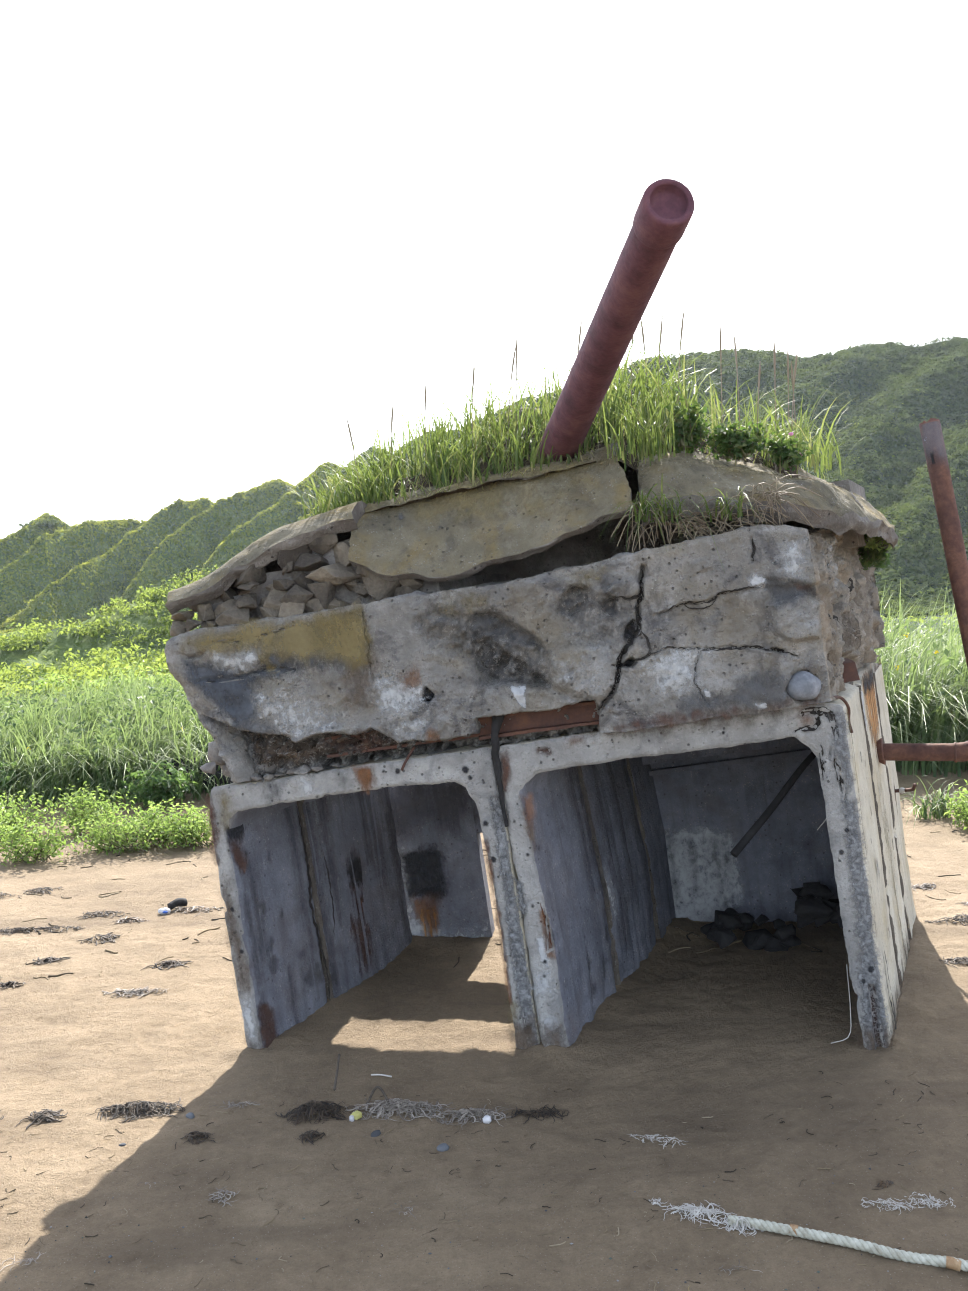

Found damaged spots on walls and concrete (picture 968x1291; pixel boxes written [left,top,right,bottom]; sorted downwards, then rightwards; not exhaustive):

crack [598,538,798,710]
crack [825,552,854,639]
rust [863,659,881,747]
rust [354,768,371,790]
rust [258,1004,276,1048]